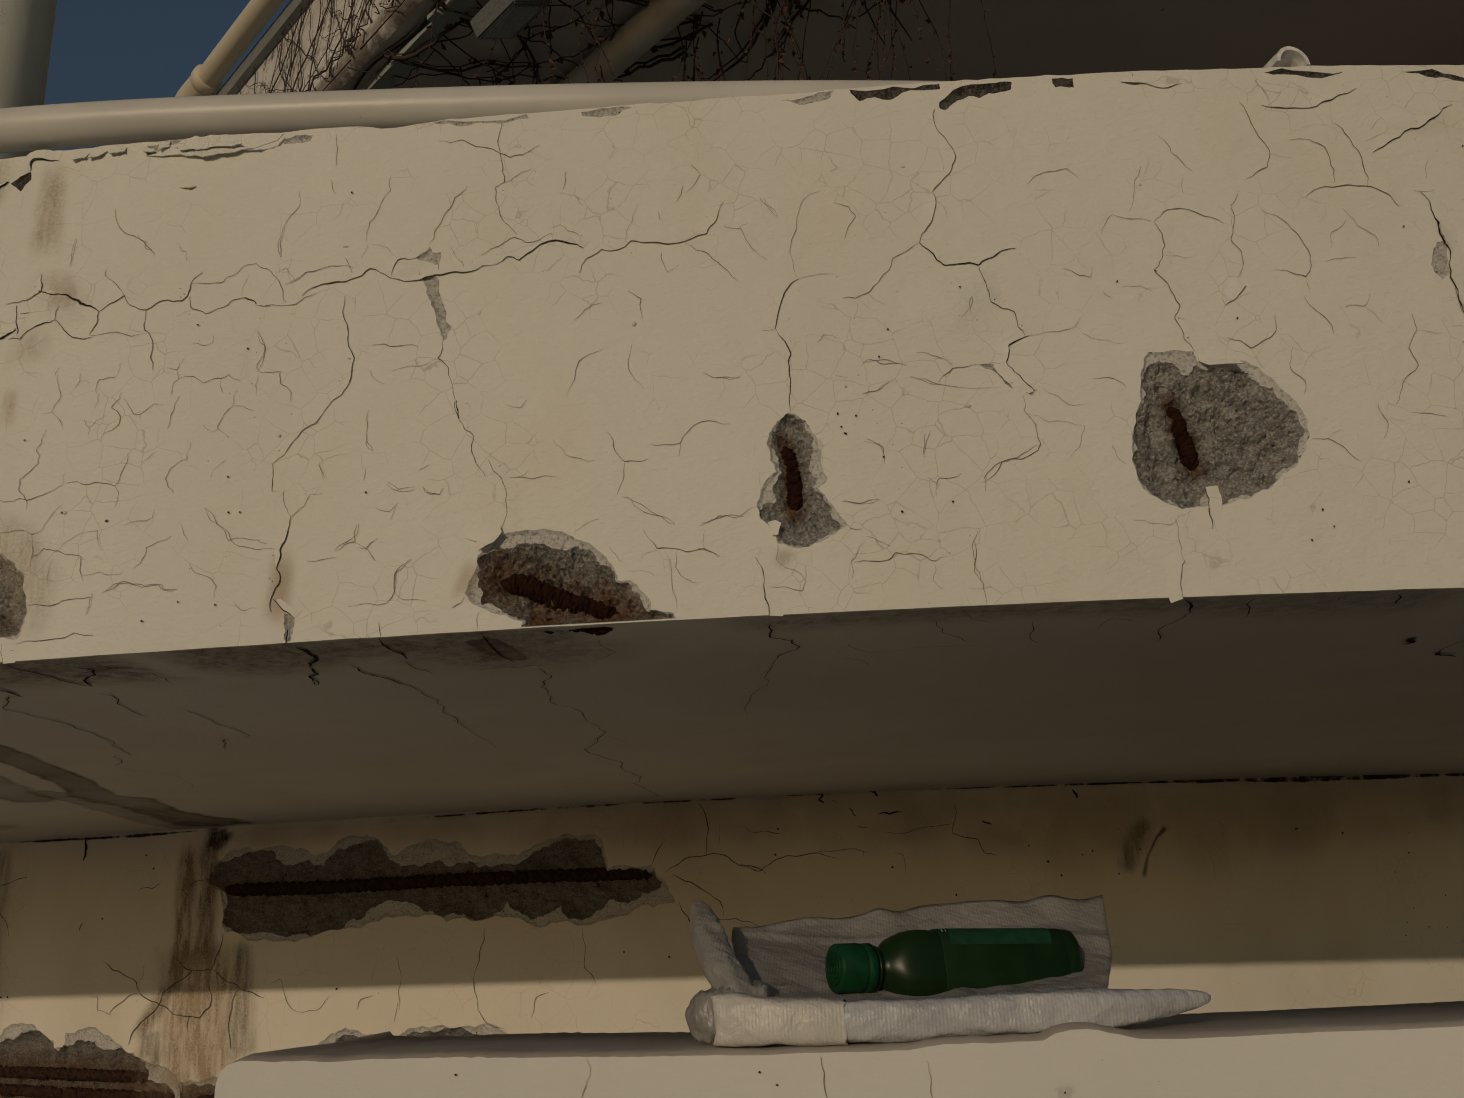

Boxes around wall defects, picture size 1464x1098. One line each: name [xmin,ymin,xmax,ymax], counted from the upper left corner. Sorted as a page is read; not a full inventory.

crack [1121,72,1182,88]
crack [1064,80,1464,461]
crack [0,106,1126,796]
spalling [757,413,847,548]
spalling [1132,350,1310,509]
spalling [465,526,677,636]
crack [1098,485,1222,641]
damp [12,800,250,861]
damp [1008,773,1464,798]
spalling [205,833,675,942]
crack [90,937,401,1045]
spalling [0,1023,218,1098]